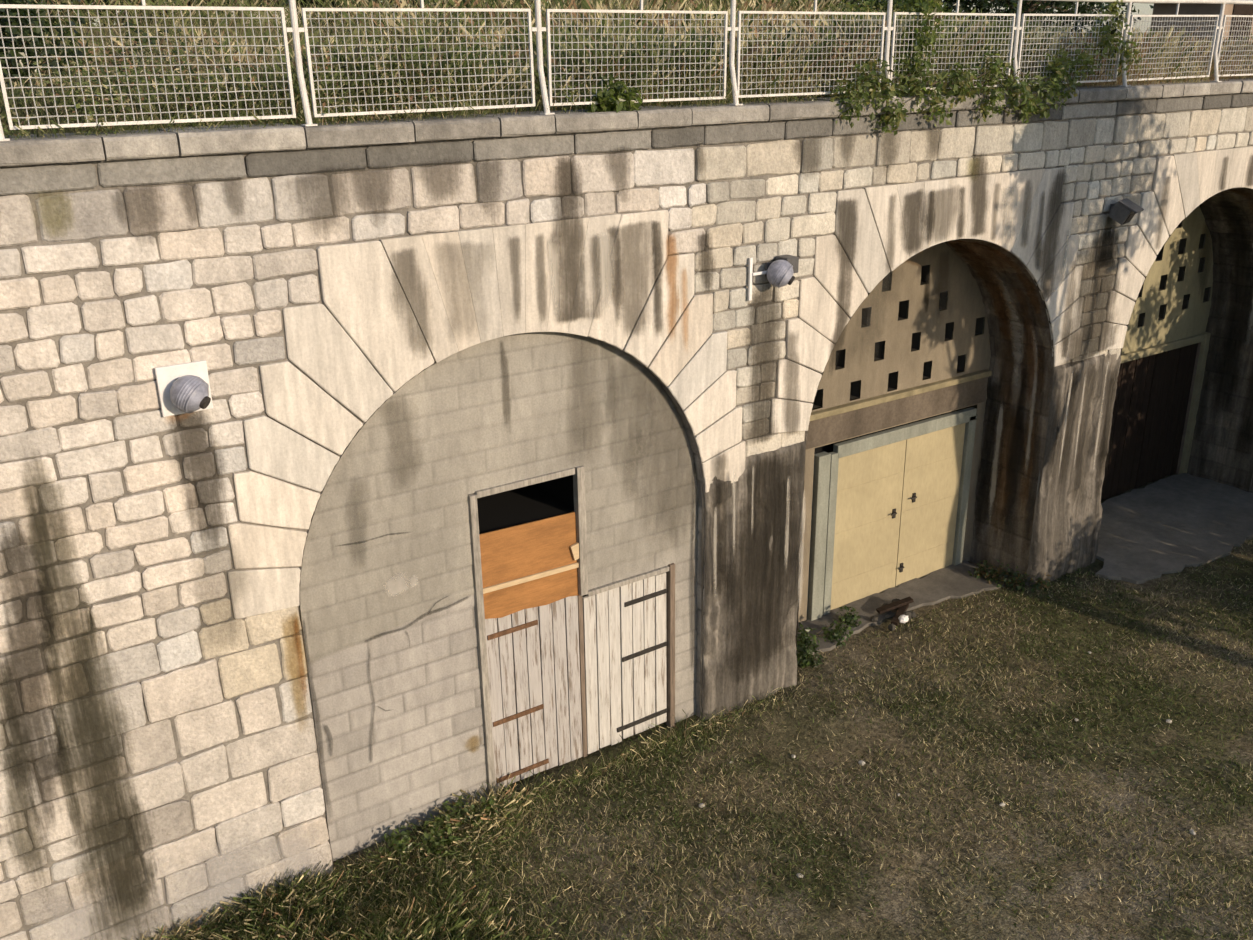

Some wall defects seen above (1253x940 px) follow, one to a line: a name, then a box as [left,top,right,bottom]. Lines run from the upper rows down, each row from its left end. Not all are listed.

water stain [560,162,583,320]
water stain [832,201,855,364]
water stain [907,192,934,249]
water stain [959,159,986,237]
water stain [1037,175,1064,295]
water stain [716,456,793,669]
water stain [6,533,57,791]